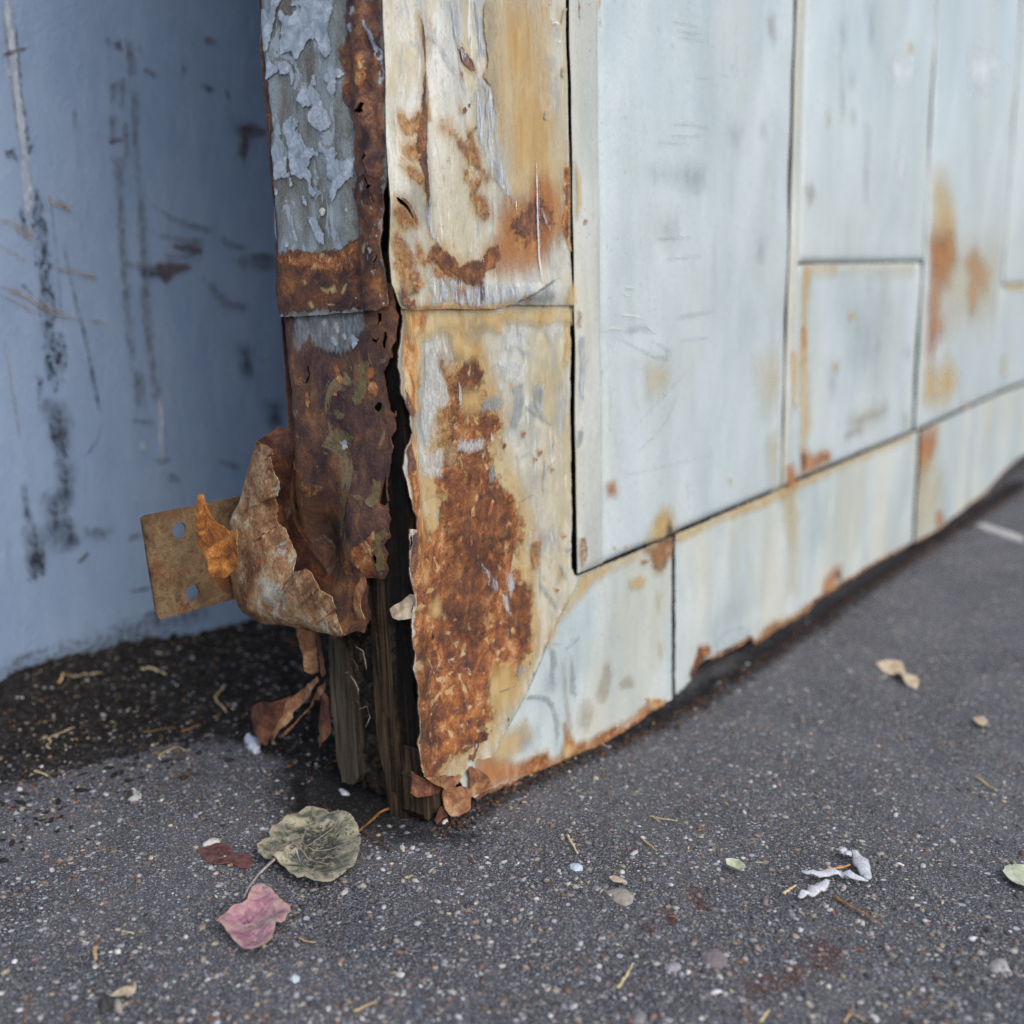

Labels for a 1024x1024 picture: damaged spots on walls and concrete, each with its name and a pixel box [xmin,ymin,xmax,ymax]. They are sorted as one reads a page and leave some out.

peeling [261,0,355,244]
corrosion [929,187,987,348]
peeling [332,409,354,455]
corrosion [275,0,666,801]
water stain [49,470,76,545]
corrosion [195,494,239,578]
peeling [339,479,381,536]